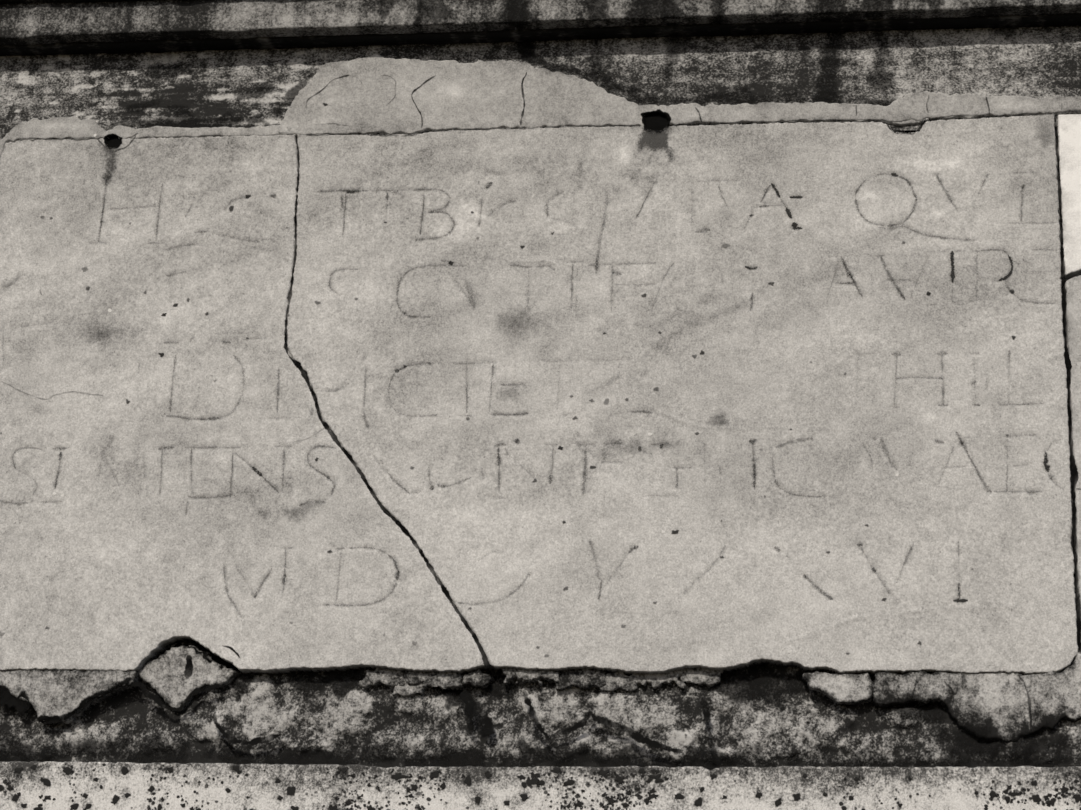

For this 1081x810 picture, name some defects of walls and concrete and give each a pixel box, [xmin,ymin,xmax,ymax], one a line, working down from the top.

damp [378,0,398,18]
damp [414,0,452,32]
damp [497,0,535,62]
damp [585,0,609,71]
damp [813,32,844,103]
damp [638,127,673,162]
crack [284,76,491,669]
spalling [138,641,241,712]
peeling [359,668,607,697]
peeling [632,667,723,689]
crack [459,691,495,736]
peeling [815,743,1072,767]